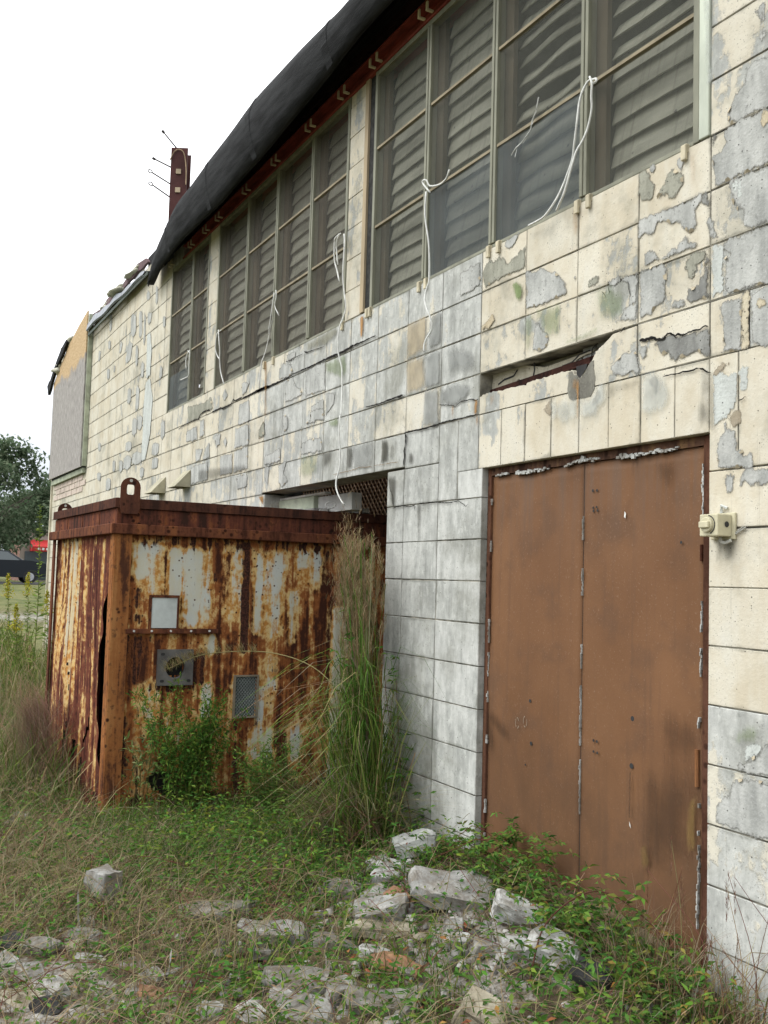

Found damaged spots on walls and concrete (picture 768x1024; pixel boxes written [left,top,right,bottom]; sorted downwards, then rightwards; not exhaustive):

peeling [754,3,767,41]
peeling [588,57,768,362]
peeling [482,232,576,309]
crack [591,325,708,356]
peeling [97,286,166,491]
spalling [567,360,595,400]
peeling [186,381,265,489]
peeling [716,421,768,493]